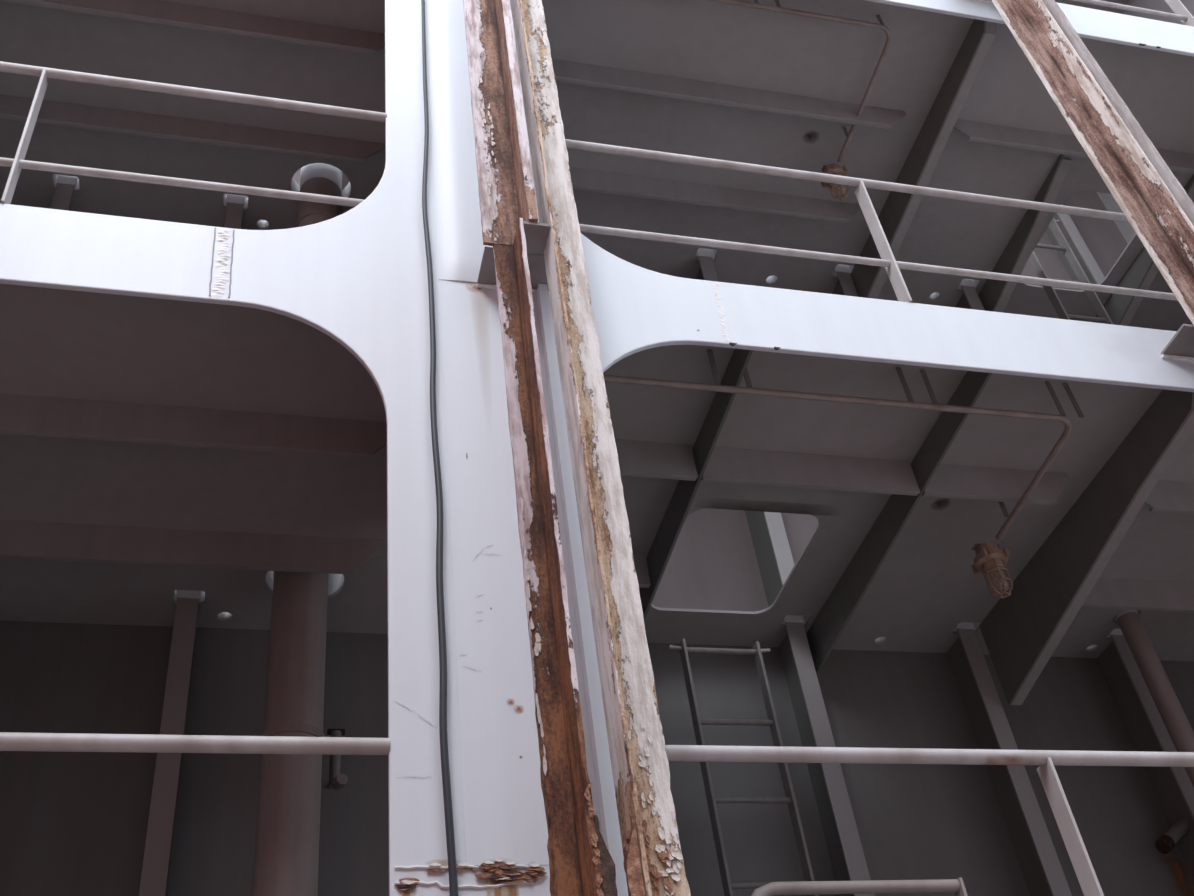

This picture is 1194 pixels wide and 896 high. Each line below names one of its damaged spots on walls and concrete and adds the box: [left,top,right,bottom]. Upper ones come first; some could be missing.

peeling [483,858,540,880]
peeling [627,721,683,896]